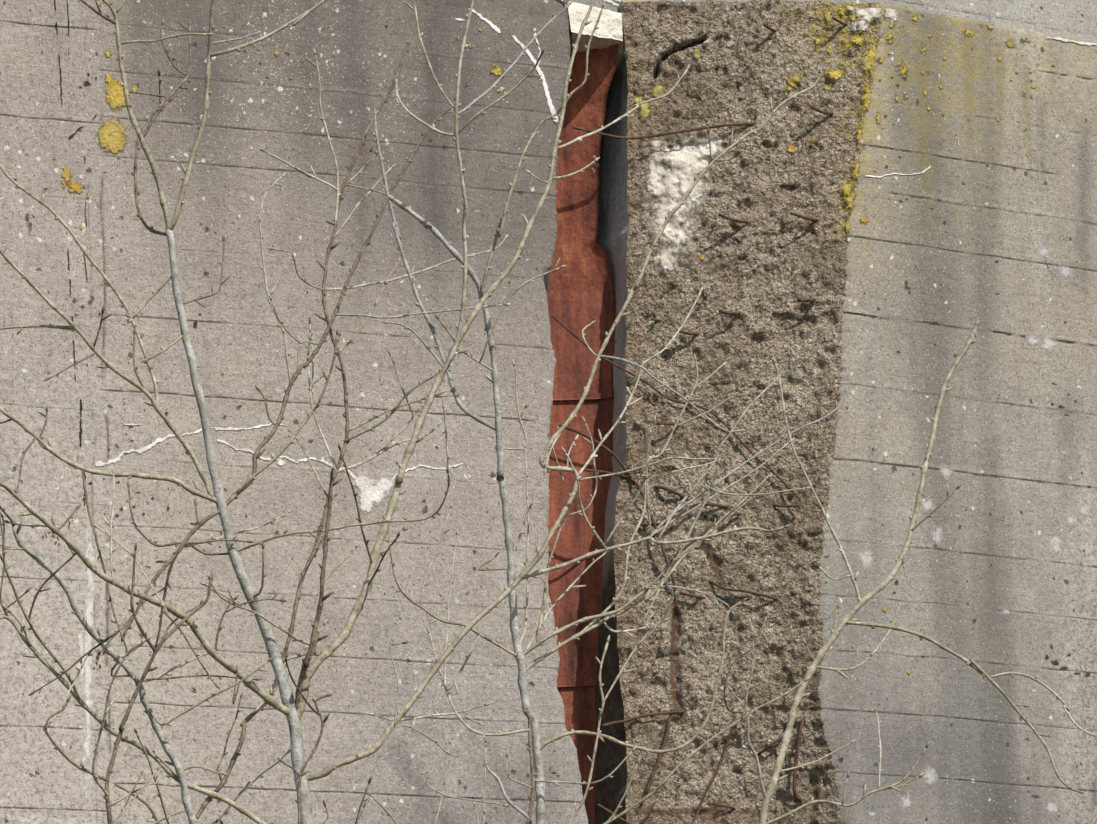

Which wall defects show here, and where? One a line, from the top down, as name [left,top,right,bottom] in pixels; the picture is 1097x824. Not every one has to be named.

crack [54,0,70,104]
crack [654,39,707,78]
damp [1046,37,1097,46]
crack [69,114,97,162]
spalling [573,122,756,149]
spalling [718,213,749,224]
crack [66,202,463,513]
rust [547,31,618,824]
spalling [551,315,802,507]
spalling [550,407,741,603]
spalling [584,710,685,824]
spalling [691,720,735,824]